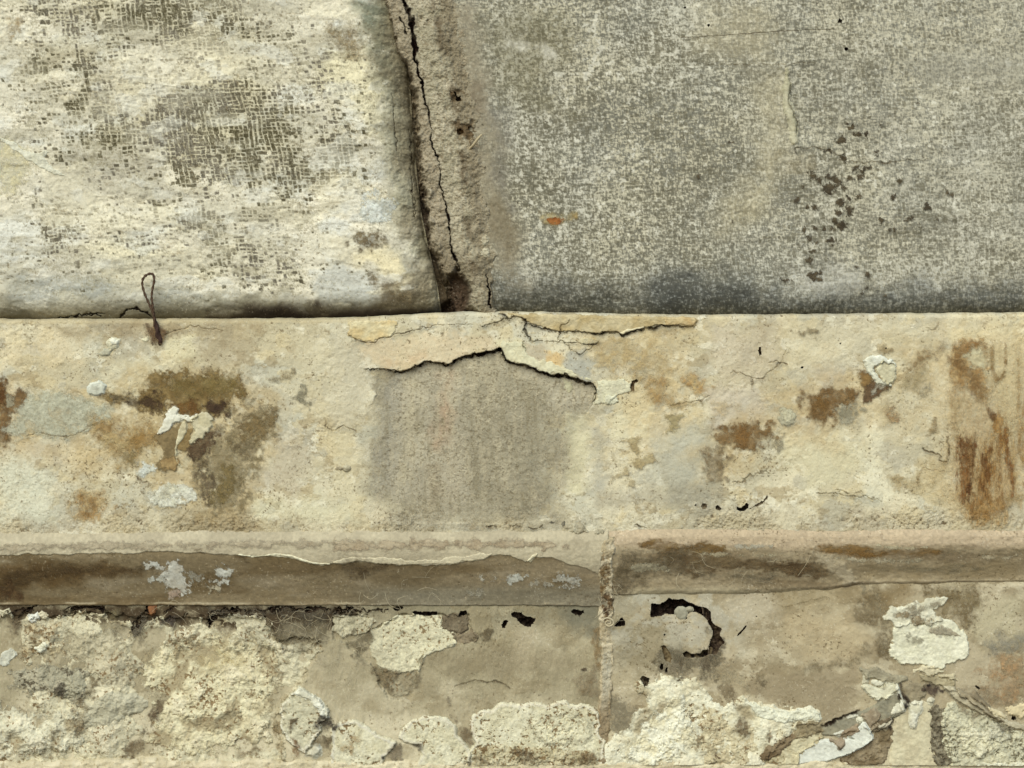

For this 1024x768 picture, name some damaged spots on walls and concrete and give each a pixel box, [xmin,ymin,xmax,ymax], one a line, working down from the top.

crack [393,0,460,271]
rust [540,213,578,225]
flaking render [508,313,698,345]
rust [0,378,27,447]
leakage [2,366,279,512]
flaking render [154,406,215,472]
flaking render [372,341,638,518]
rust [949,338,1024,527]
leakage [111,557,245,600]
leakage [613,539,828,594]
leakage [818,544,980,629]
flaking render [0,605,822,765]